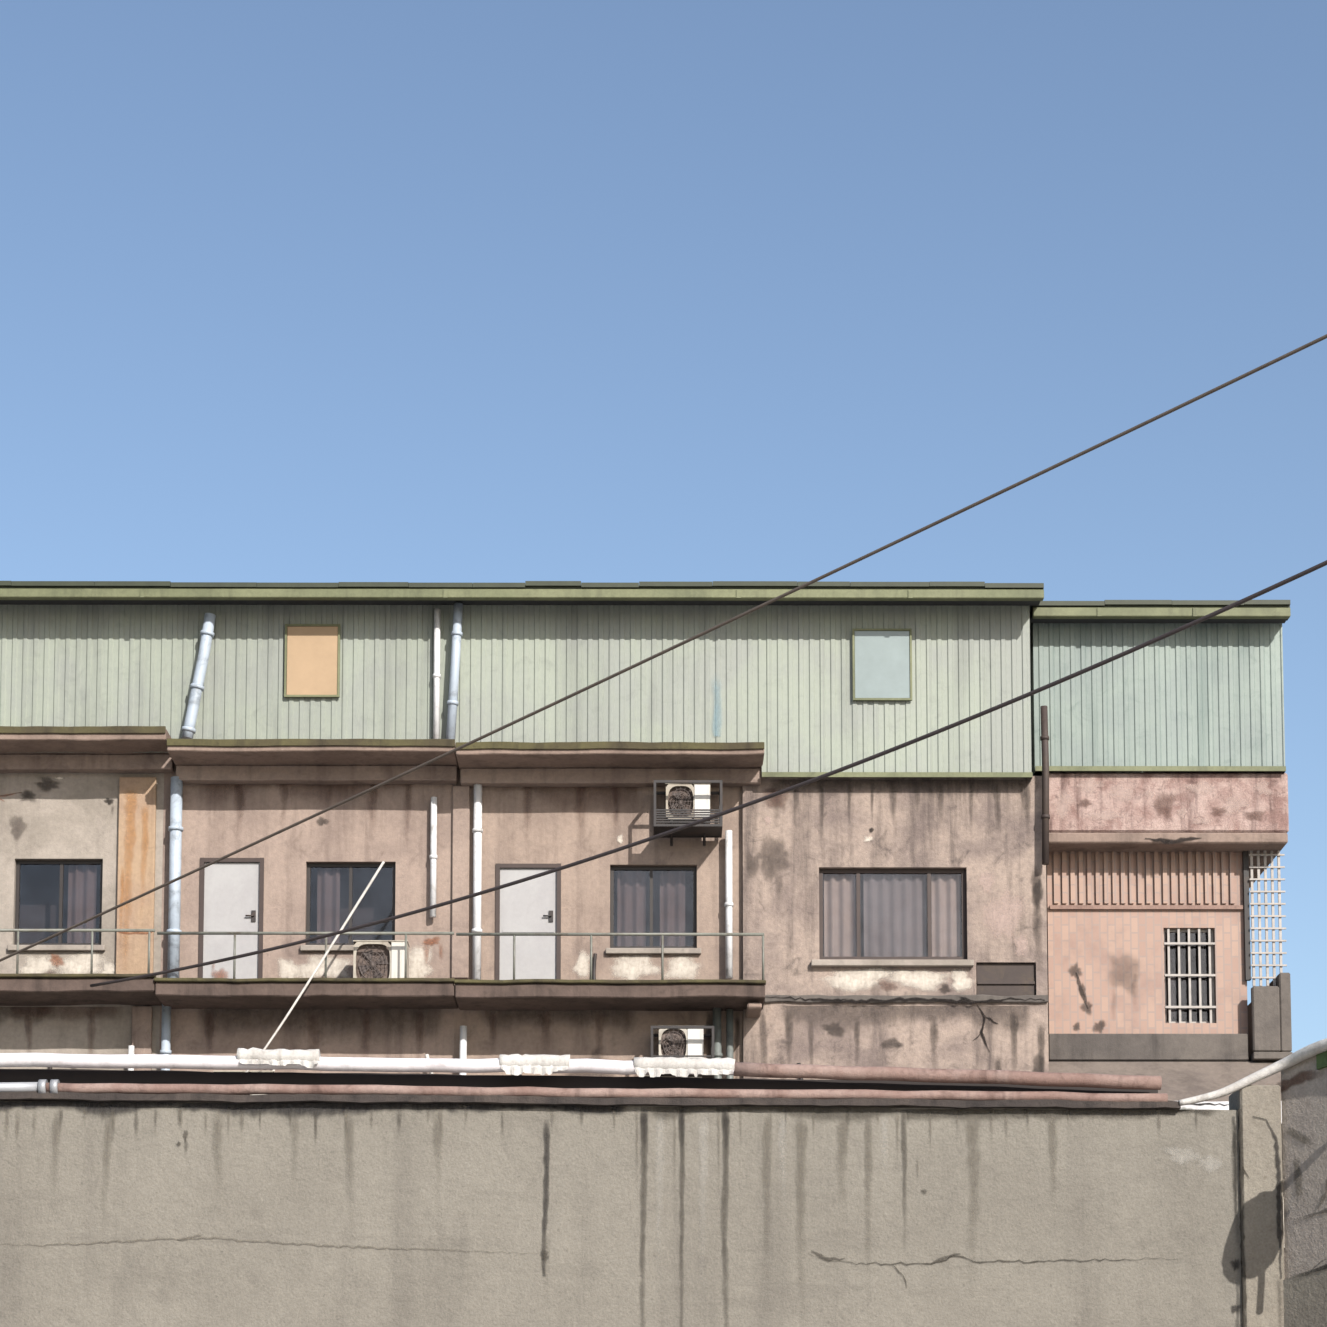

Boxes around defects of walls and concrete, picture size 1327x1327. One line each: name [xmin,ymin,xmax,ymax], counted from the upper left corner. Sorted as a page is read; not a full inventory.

peeling [575,953,589,976]
peeling [614,954,697,980]
peeling [827,969,971,993]
leakage [1071,967,1104,1031]
leakage [787,1006,1023,1035]
crack [770,996,1043,1052]
leakage [541,1127,549,1272]
crack [808,1250,1174,1289]